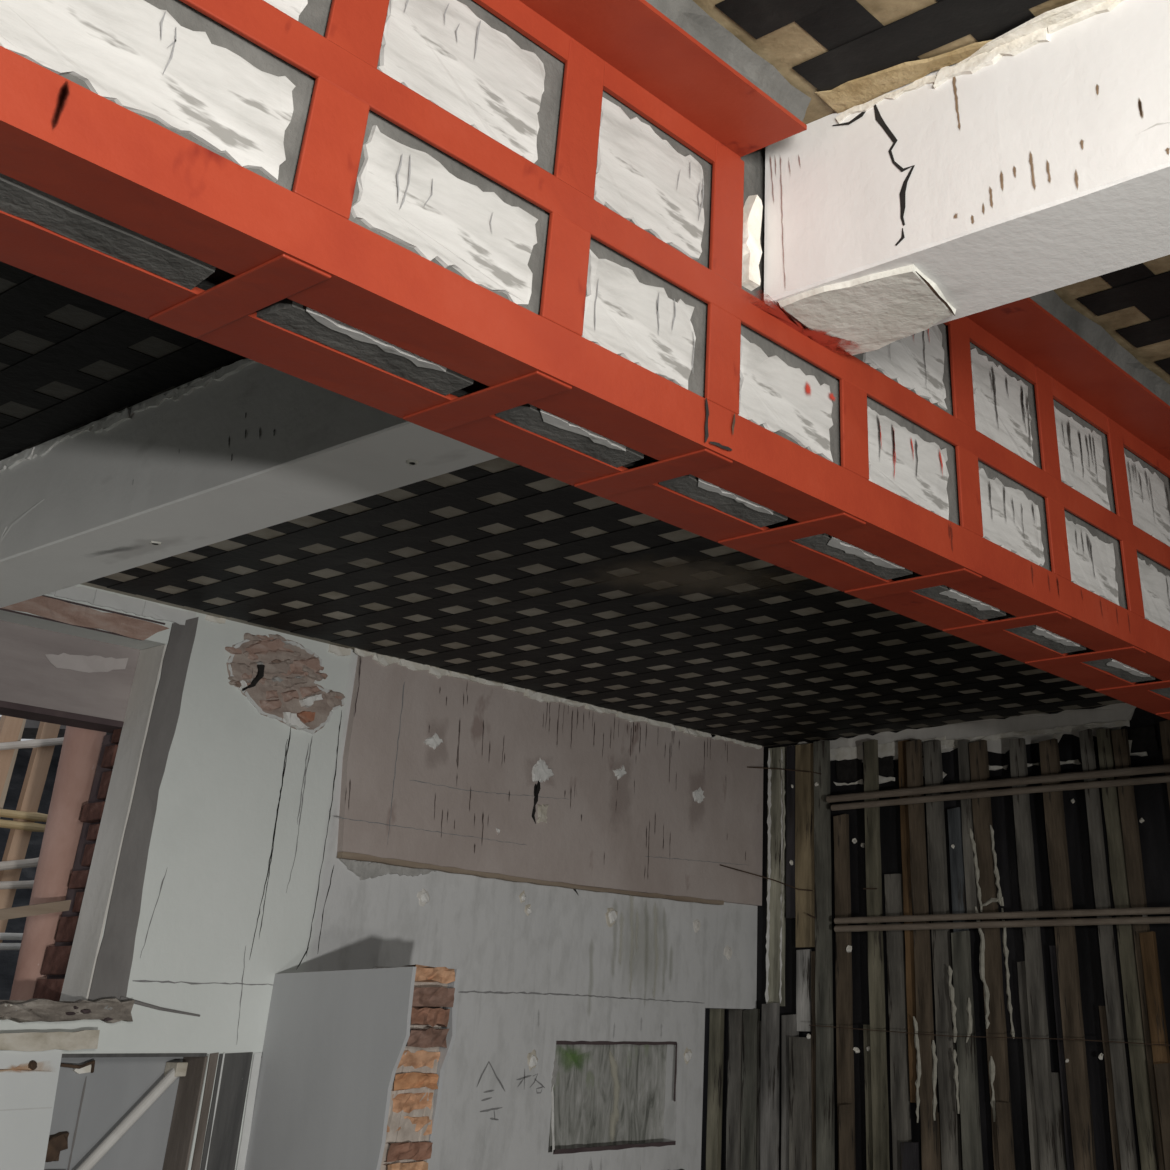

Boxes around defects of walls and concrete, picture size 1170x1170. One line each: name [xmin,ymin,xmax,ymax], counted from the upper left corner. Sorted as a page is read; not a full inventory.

rust [953,77,961,130]
peeling [815,0,1125,124]
crack [833,104,915,246]
rust [971,166,1016,224]
rust [1029,152,1051,189]
crack [915,271,955,316]
spalling [225,633,762,749]
crack [133,656,567,1040]
damp [947,825,1015,1114]
damp [913,1016,937,1123]